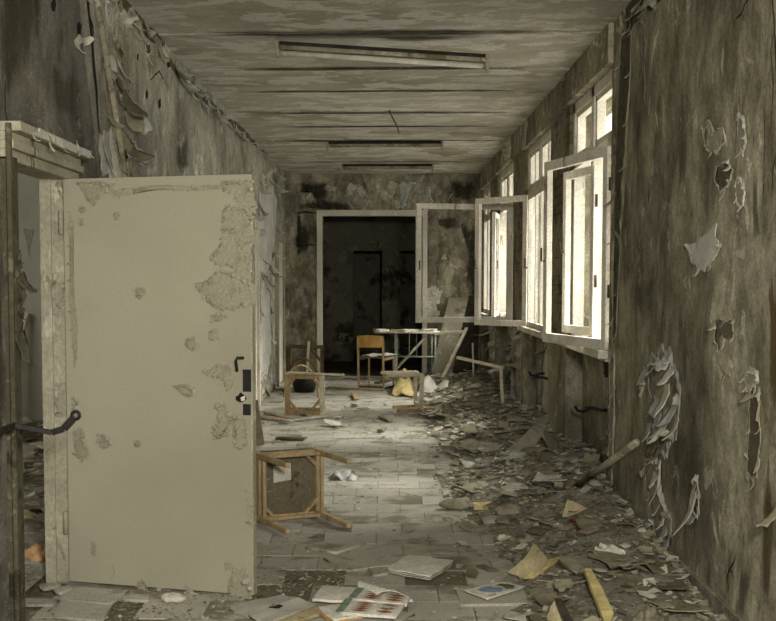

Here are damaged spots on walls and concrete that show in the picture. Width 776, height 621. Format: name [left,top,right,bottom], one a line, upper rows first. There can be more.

crack [763,0,776,198]
spalling [31,0,289,398]
damp [296,183,351,253]
damp [452,181,475,200]
spalling [699,111,747,212]
peeling [410,0,729,621]
spalling [708,315,735,351]
peeling [202,363,250,450]
spalling [738,366,762,493]
peeling [756,502,776,528]